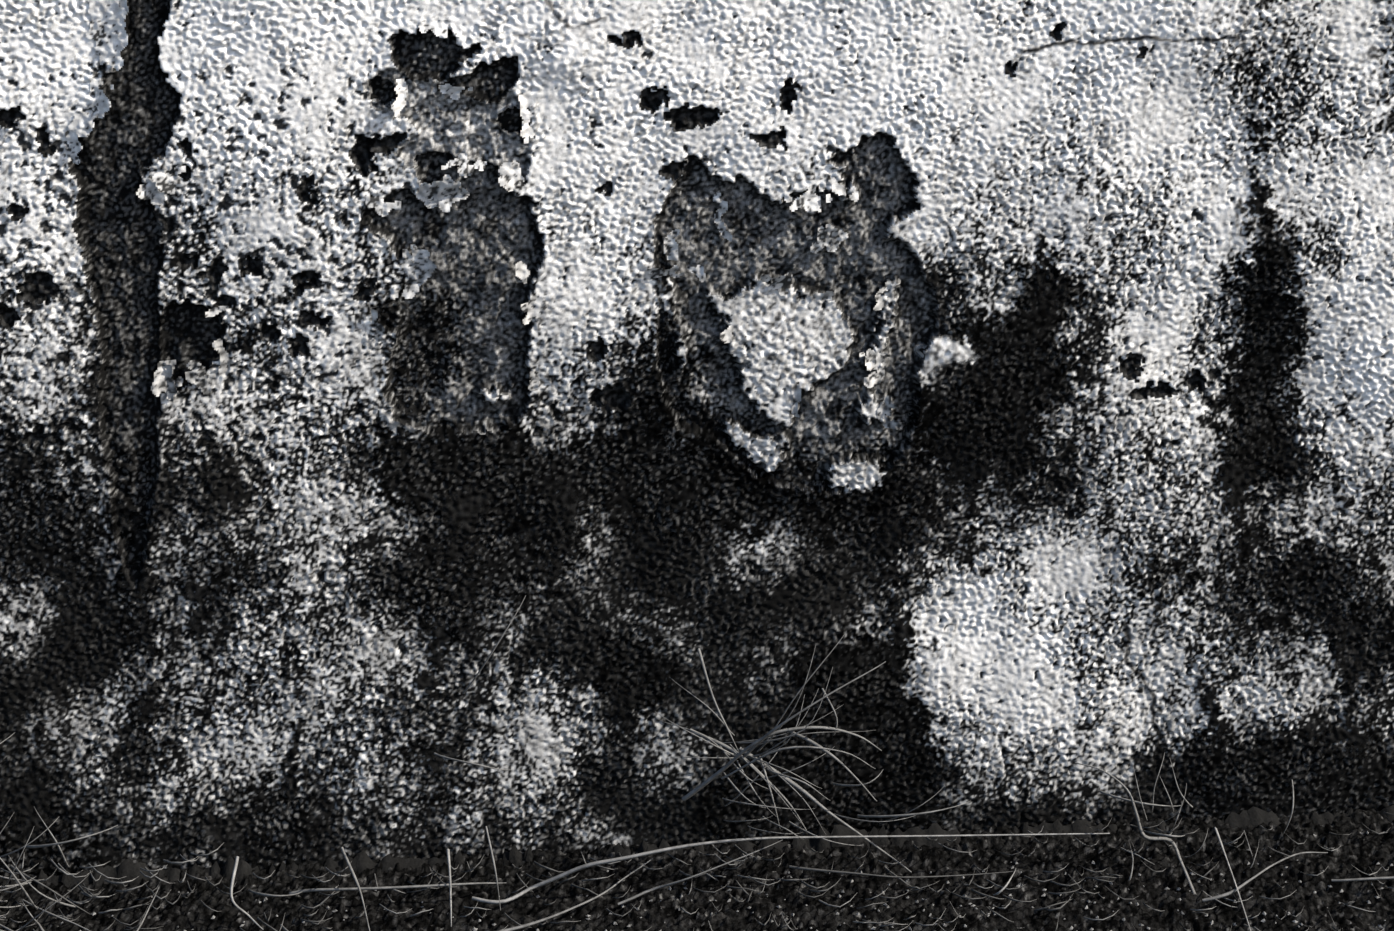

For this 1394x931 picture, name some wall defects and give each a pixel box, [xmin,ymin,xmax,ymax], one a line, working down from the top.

crack [1023,35,1244,53]
water stain [0,725,101,880]
water stain [0,449,260,795]
water stain [236,673,326,870]
peeling [349,20,548,435]
water stain [367,224,1088,844]
peeling [643,132,939,495]
water stain [1123,0,1394,820]